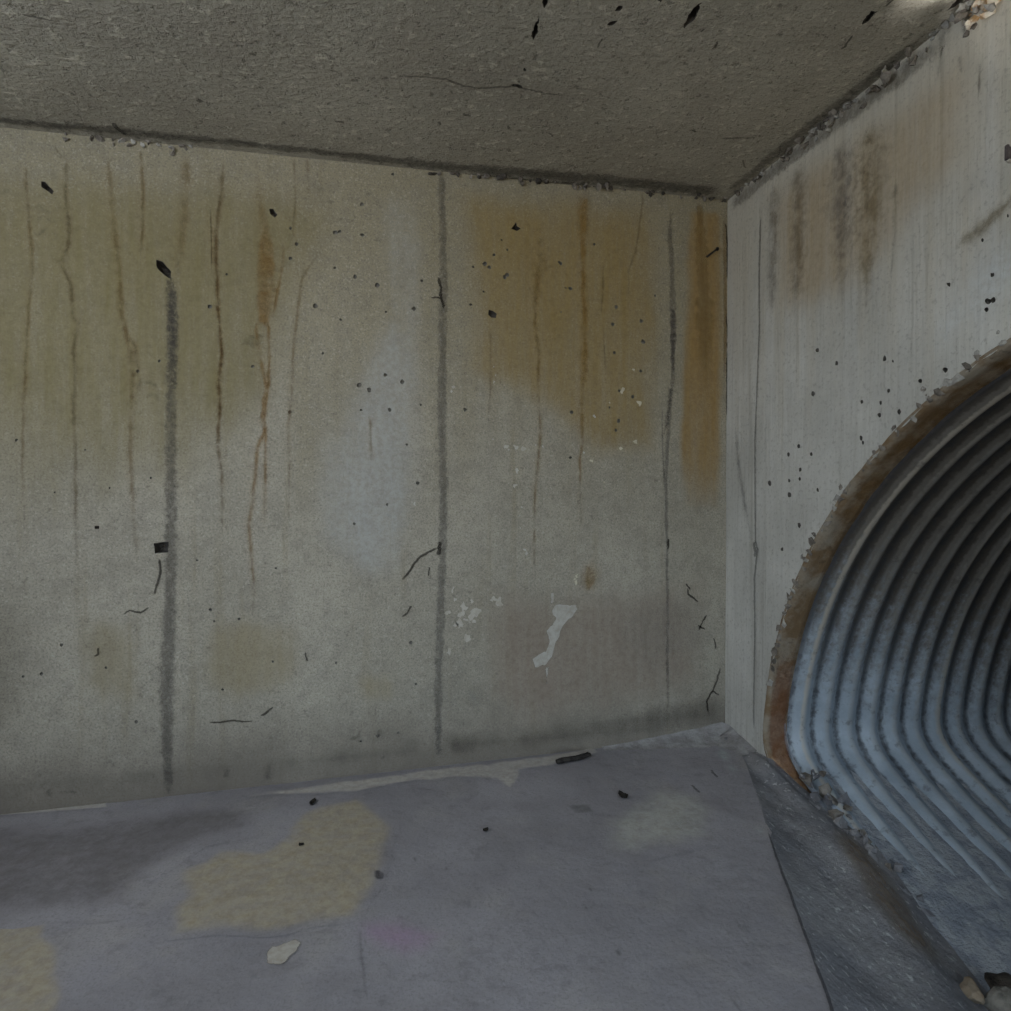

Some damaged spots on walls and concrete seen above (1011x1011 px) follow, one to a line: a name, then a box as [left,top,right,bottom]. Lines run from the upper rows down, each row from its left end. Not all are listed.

spalling [694,0,1002,202]
water stain [0,137,439,606]
rust [444,172,727,516]
crack [404,542,442,578]
water stain [64,600,158,717]
water stain [183,602,315,717]
peeling [533,593,577,684]
crack [686,584,720,711]
spalling [799,769,904,872]